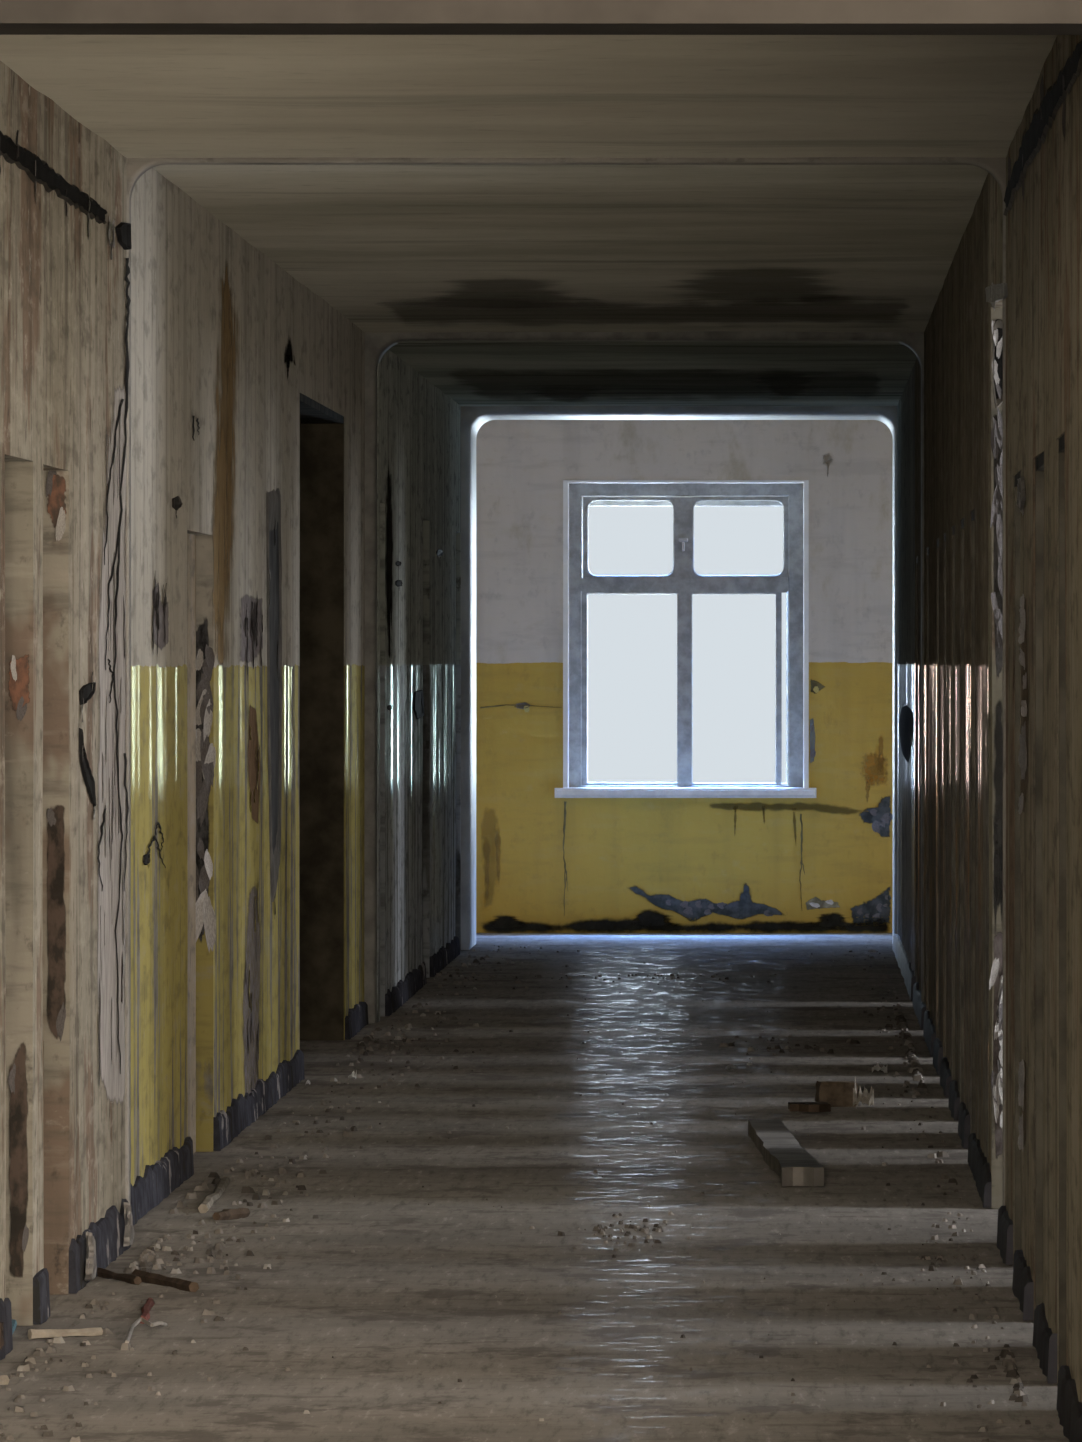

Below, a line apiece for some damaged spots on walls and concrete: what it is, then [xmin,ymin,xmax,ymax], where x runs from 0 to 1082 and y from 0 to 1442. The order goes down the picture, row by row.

damp [711,803,857,841]
peeling [859,796,893,837]
damp [483,910,889,933]
peeling [629,883,783,922]
peeling [806,887,891,924]